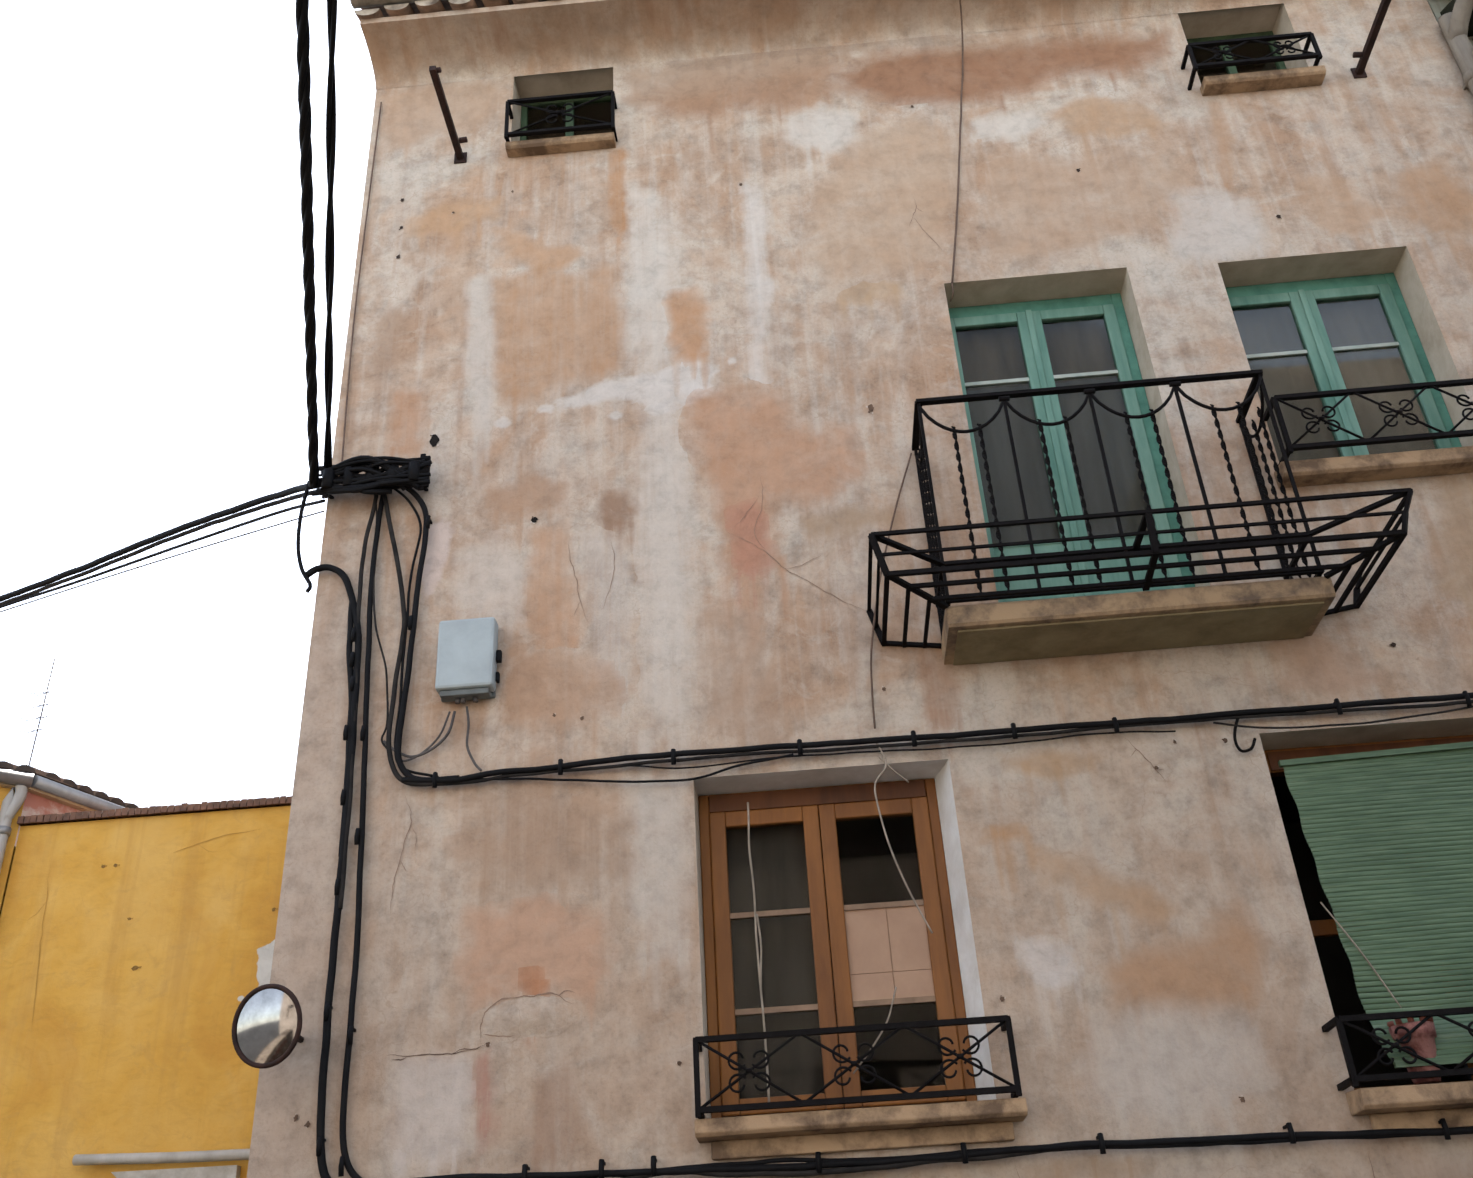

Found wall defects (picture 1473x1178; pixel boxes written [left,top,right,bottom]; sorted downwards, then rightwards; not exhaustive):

peeling [235,936,275,1005]
crack [396,990,575,1061]